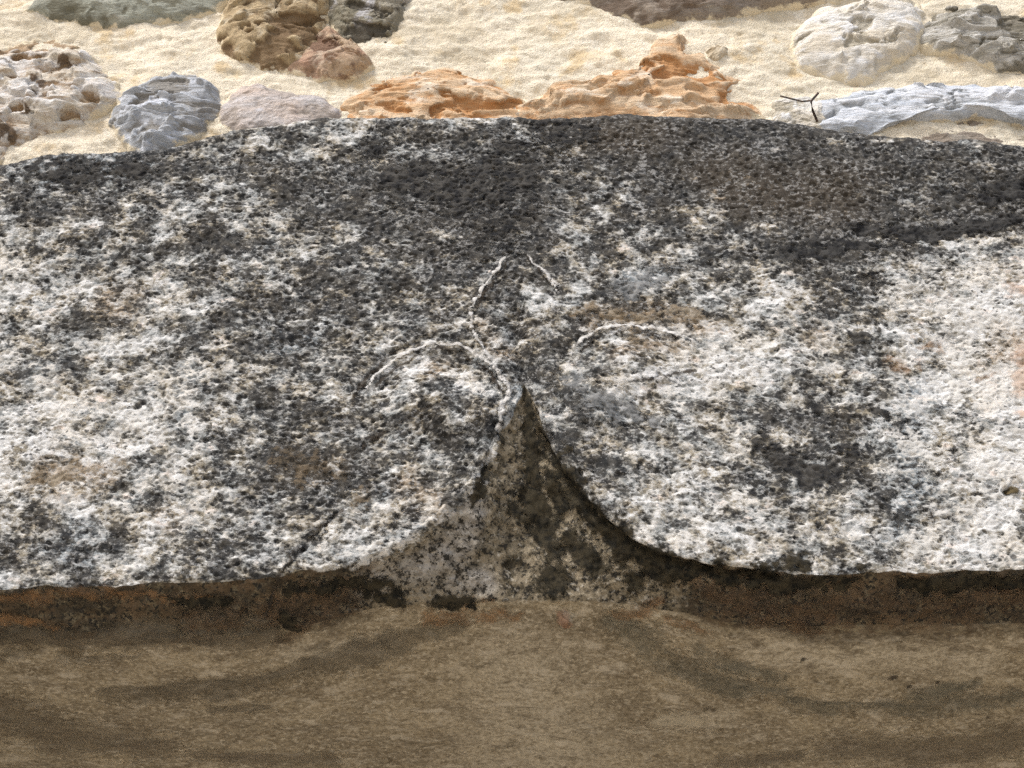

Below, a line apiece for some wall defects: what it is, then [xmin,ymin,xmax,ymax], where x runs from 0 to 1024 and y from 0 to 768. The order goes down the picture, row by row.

crack [348,347,405,405]
crack [611,369,694,384]
spalling [320,528,393,569]